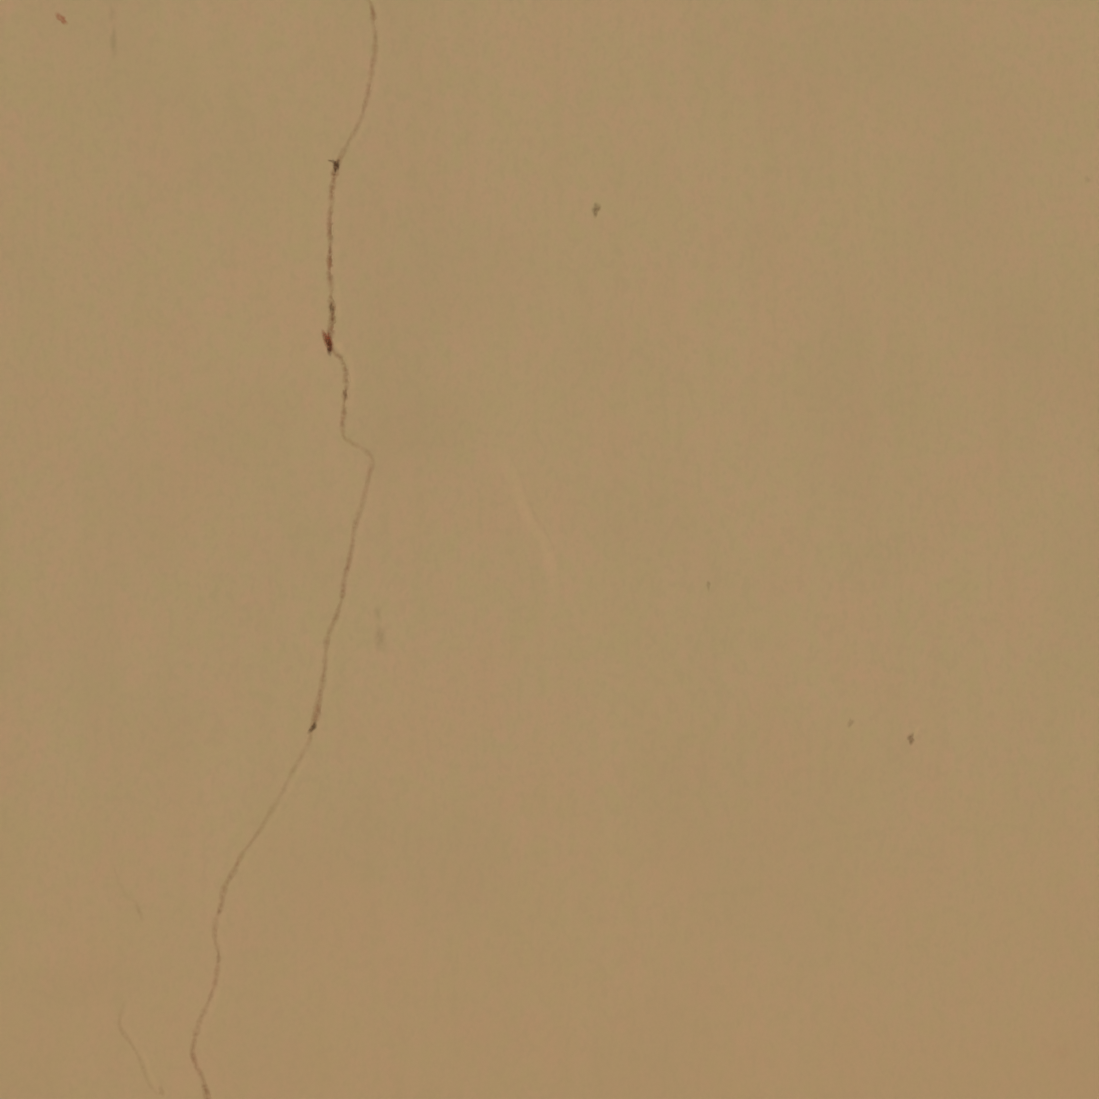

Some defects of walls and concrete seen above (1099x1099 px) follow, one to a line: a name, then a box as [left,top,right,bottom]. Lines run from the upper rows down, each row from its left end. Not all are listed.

crack [189,0,385,1099]